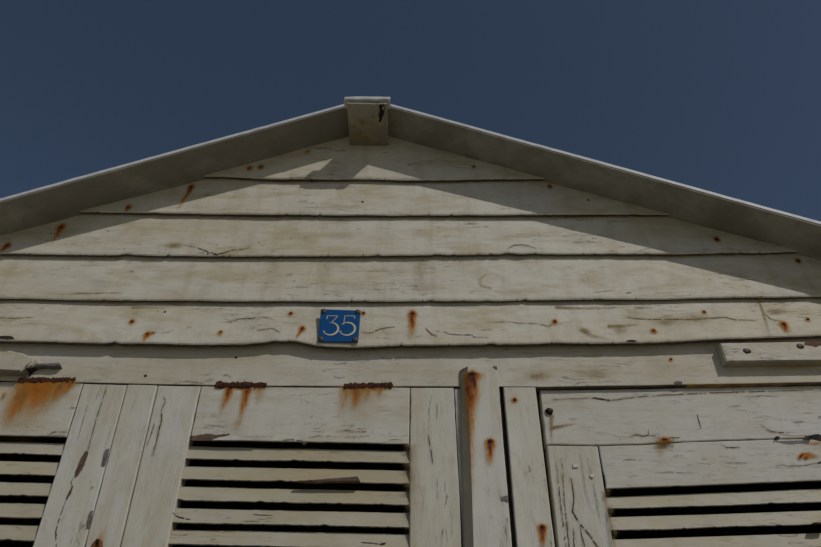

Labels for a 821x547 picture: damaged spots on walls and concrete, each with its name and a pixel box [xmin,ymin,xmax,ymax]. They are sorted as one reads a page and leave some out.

rust [408,310,417,332]
rust [2,381,74,420]
rust [464,370,481,443]
peeling [774,433,821,441]
rust [485,438,495,462]
crack [556,458,601,547]
rust [538,524,547,545]